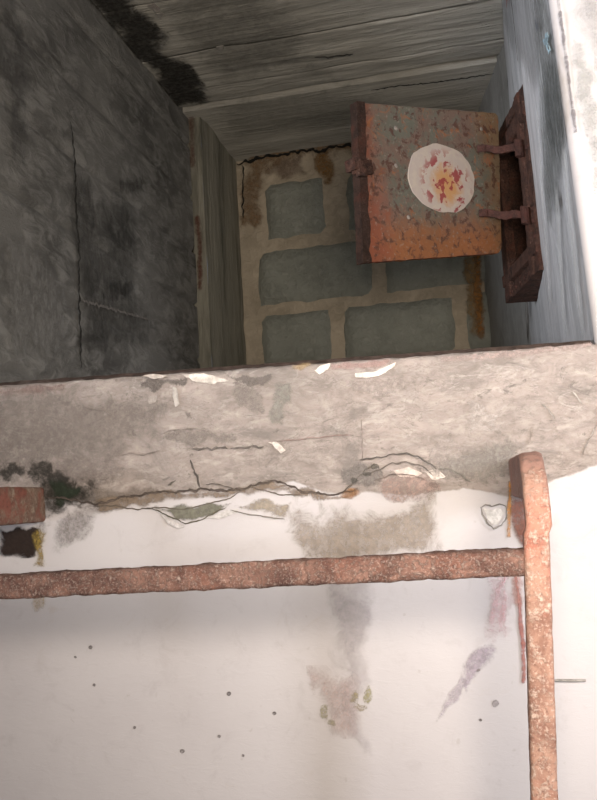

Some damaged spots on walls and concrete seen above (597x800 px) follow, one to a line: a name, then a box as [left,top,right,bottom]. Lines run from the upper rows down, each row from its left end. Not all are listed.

water stain [530,0,597,330]
water stain [0,392,146,540]
crack [46,421,471,512]
peeling [146,499,288,529]
water stain [294,498,433,558]
corrosion [507,481,525,544]
corrosion [492,577,526,683]